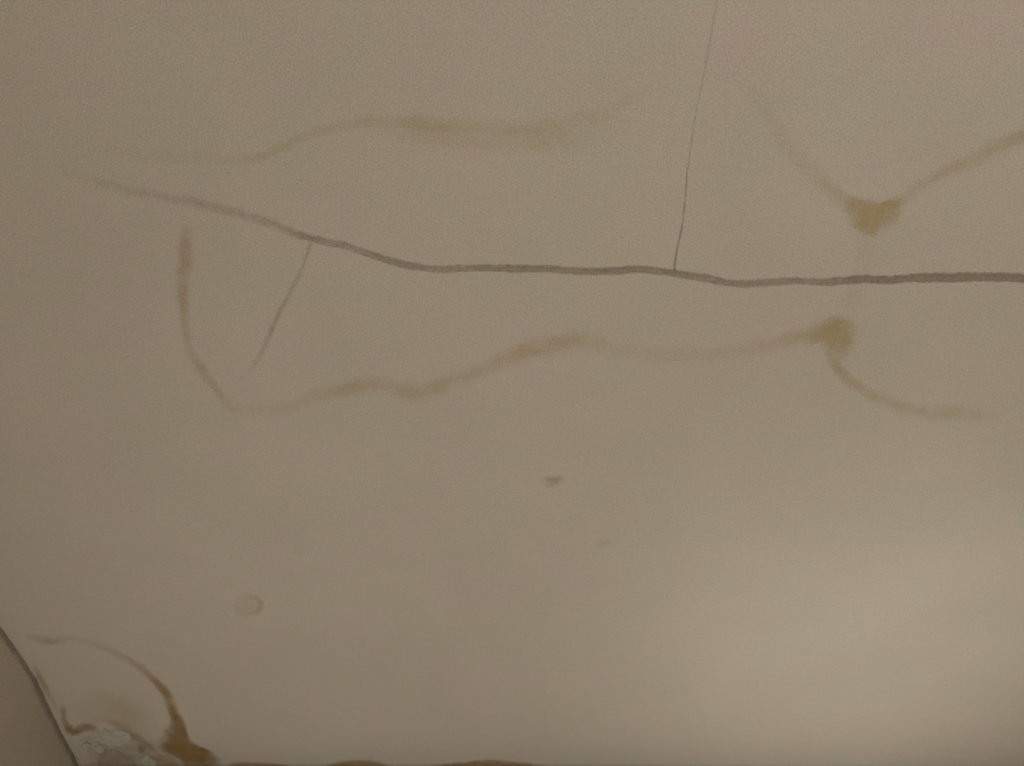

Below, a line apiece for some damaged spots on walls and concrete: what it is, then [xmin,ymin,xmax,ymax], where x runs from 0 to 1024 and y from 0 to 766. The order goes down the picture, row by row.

crack [61,1,1024,370]
leakage [93,77,1024,426]